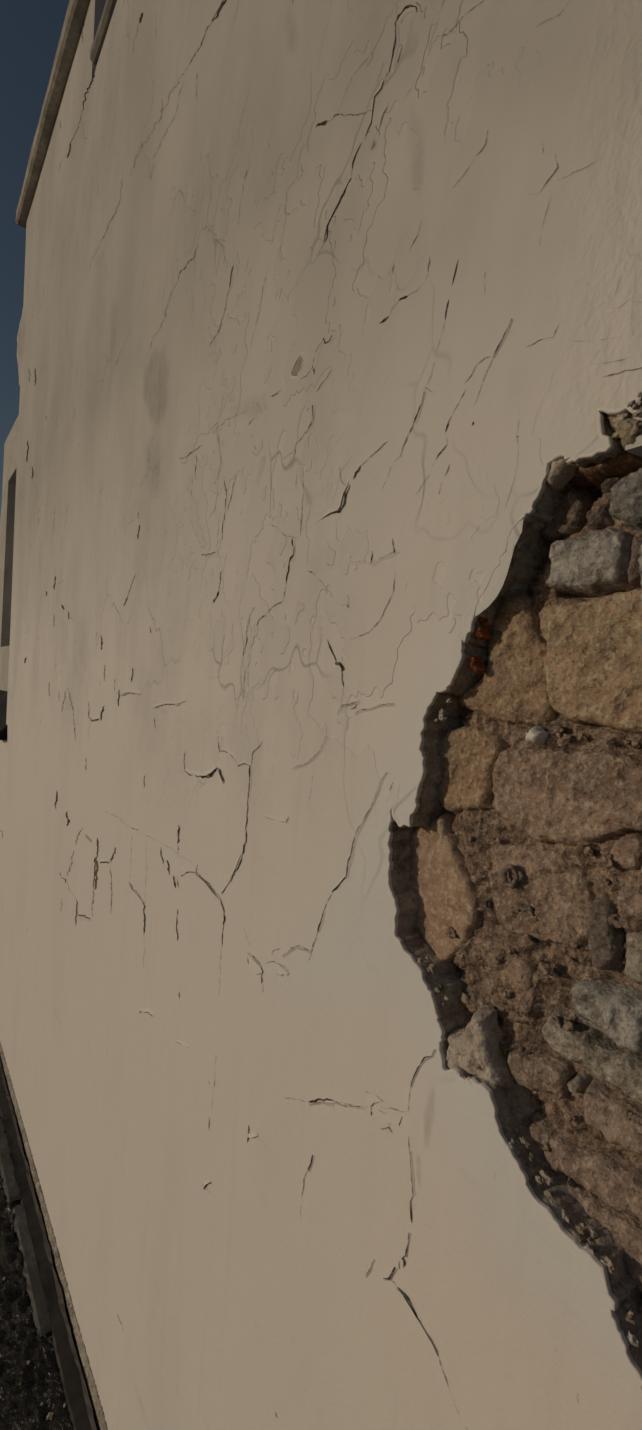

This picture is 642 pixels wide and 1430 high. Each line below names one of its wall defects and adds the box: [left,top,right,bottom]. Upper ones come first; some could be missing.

crack [60,24,96,158]
crack [191,0,227,62]
crack [315,1,483,246]
crack [379,237,458,324]
crack [608,368,642,418]
crack [243,318,555,655]
crack [327,581,395,687]
crack [54,792,179,940]
crack [218,737,259,944]
crack [312,772,393,947]
flaking render [386,405,642,1393]
crack [366,1049,448,1385]